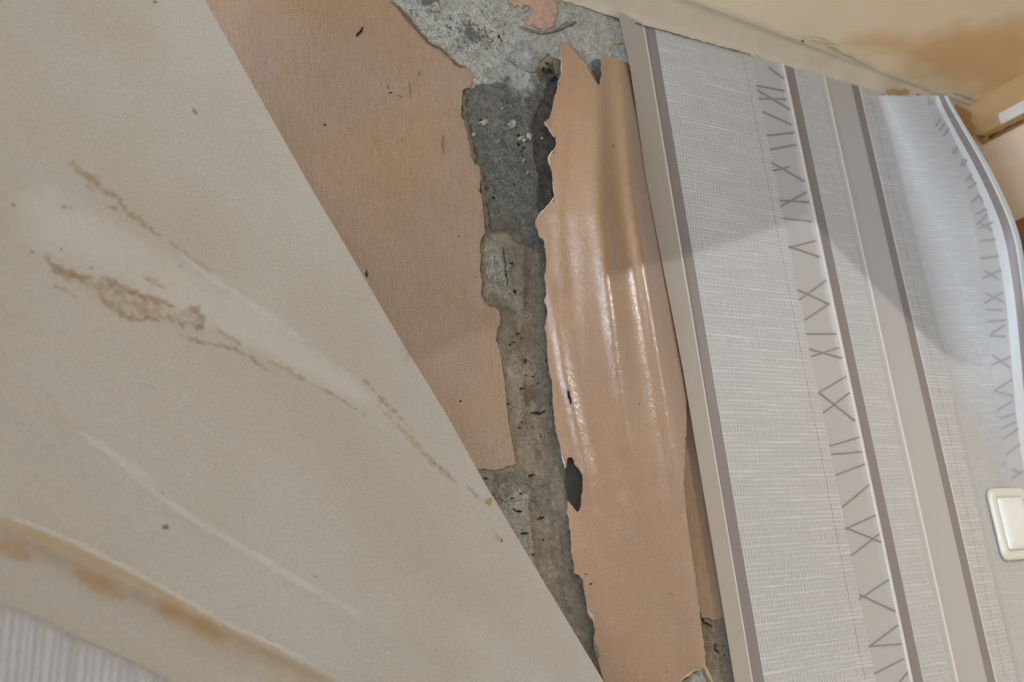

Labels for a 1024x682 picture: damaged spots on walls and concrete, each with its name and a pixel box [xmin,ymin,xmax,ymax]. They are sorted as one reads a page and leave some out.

peeling [205,0,724,682]